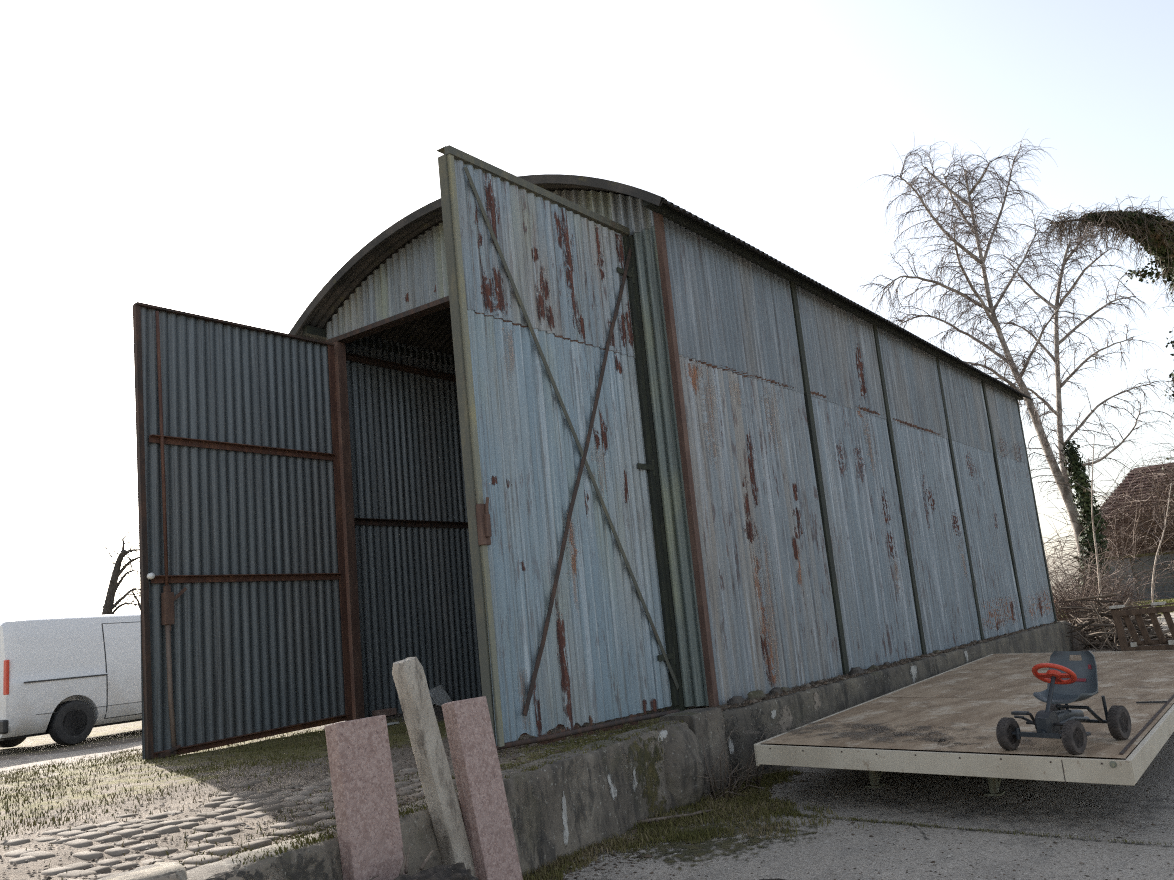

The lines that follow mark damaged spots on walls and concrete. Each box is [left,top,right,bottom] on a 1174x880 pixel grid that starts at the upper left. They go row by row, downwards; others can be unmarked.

rust [474,180,634,374]
rust [856,347,880,417]
rust [743,426,776,687]
rust [835,440,866,481]
rust [882,487,896,560]
rust [532,601,657,746]